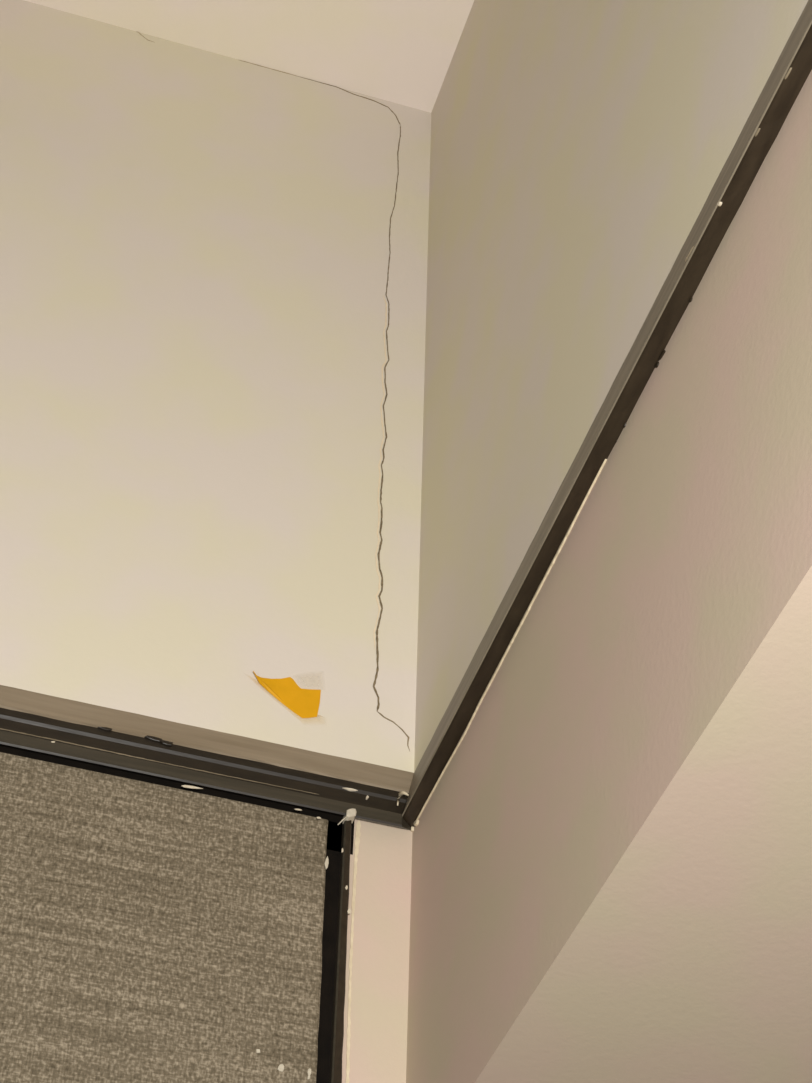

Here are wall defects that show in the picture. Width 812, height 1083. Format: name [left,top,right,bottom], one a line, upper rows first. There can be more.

crack [240,60,410,751]